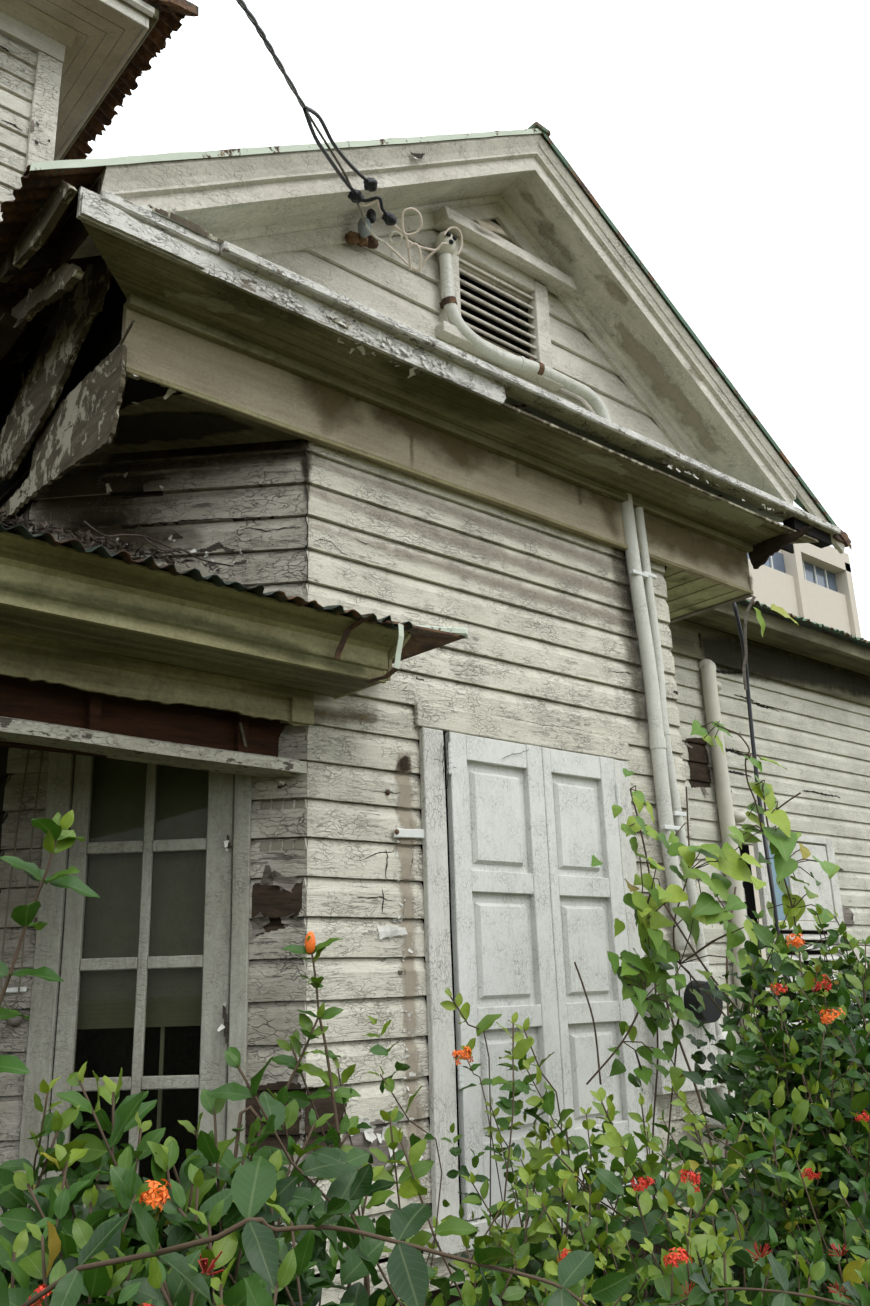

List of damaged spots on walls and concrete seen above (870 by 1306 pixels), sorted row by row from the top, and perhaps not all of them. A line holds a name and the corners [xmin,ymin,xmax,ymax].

damp [596,277,627,303]
damp [301,377,359,420]
damp [390,364,517,423]
damp [618,324,716,451]
damp [0,407,643,726]
peeling [251,865,303,936]